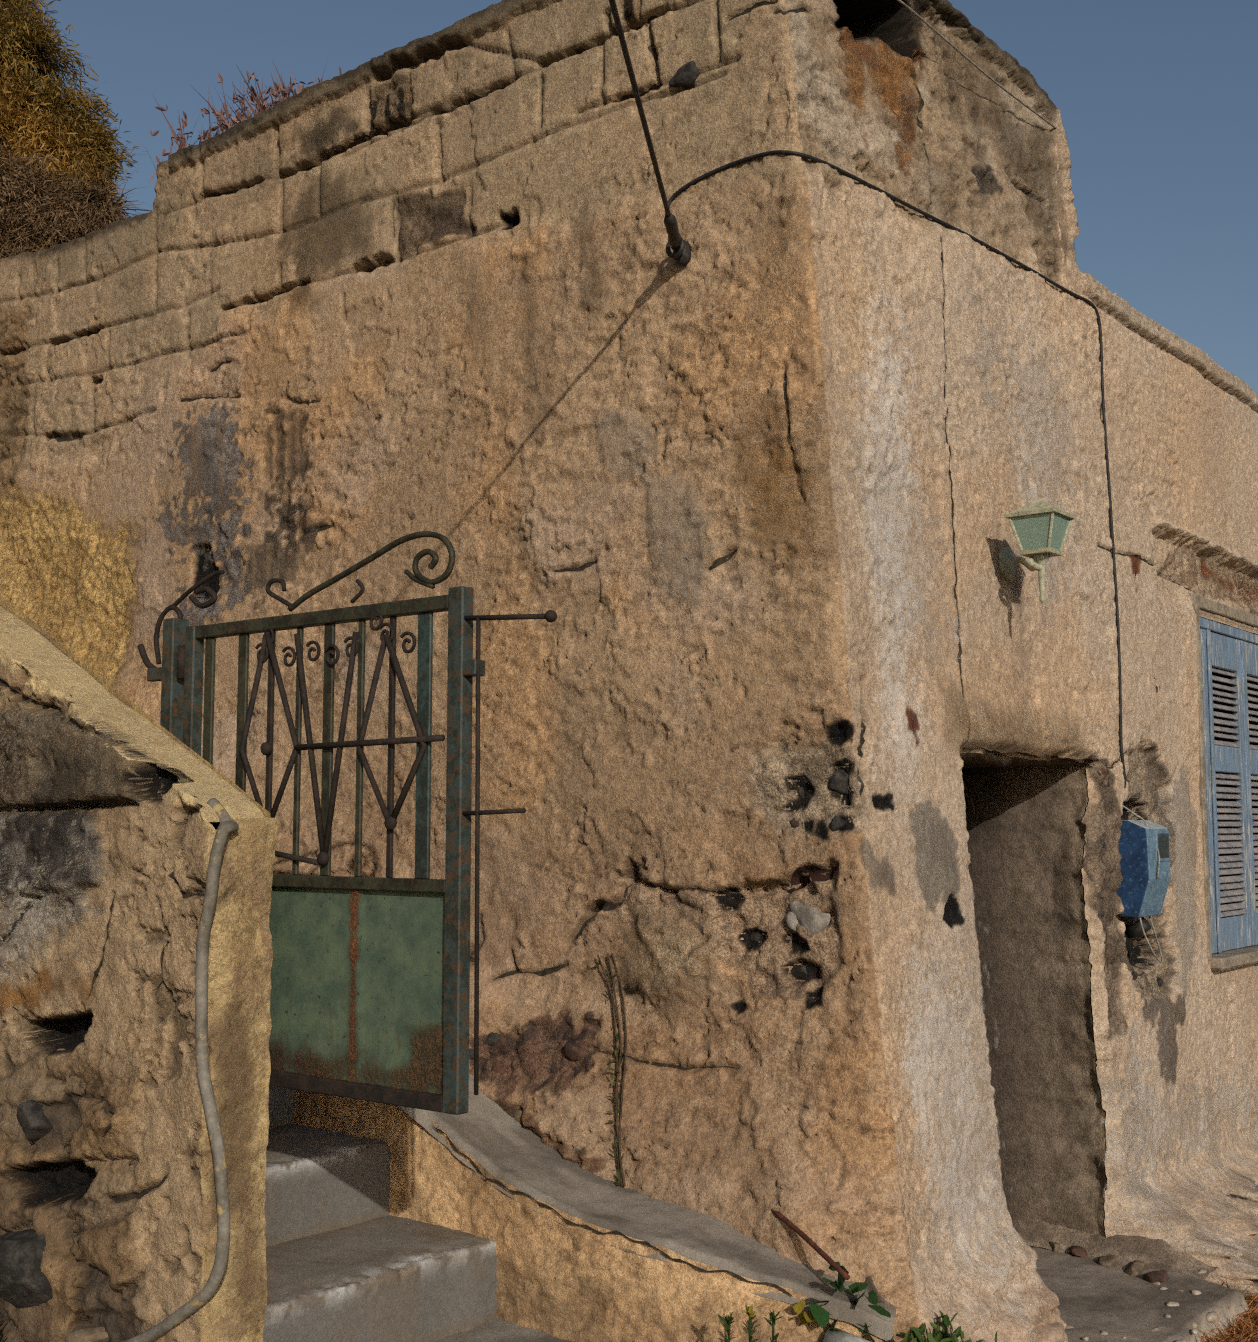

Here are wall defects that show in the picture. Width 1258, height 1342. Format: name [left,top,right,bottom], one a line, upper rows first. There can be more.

corrosion [837,27,924,175]
crack [910,66,929,163]
crack [783,361,805,501]
crack [927,201,970,739]
spalling [1159,547,1258,613]
spalling [748,741,864,832]
spalling [469,1009,604,1172]
crack [433,1126,793,1297]